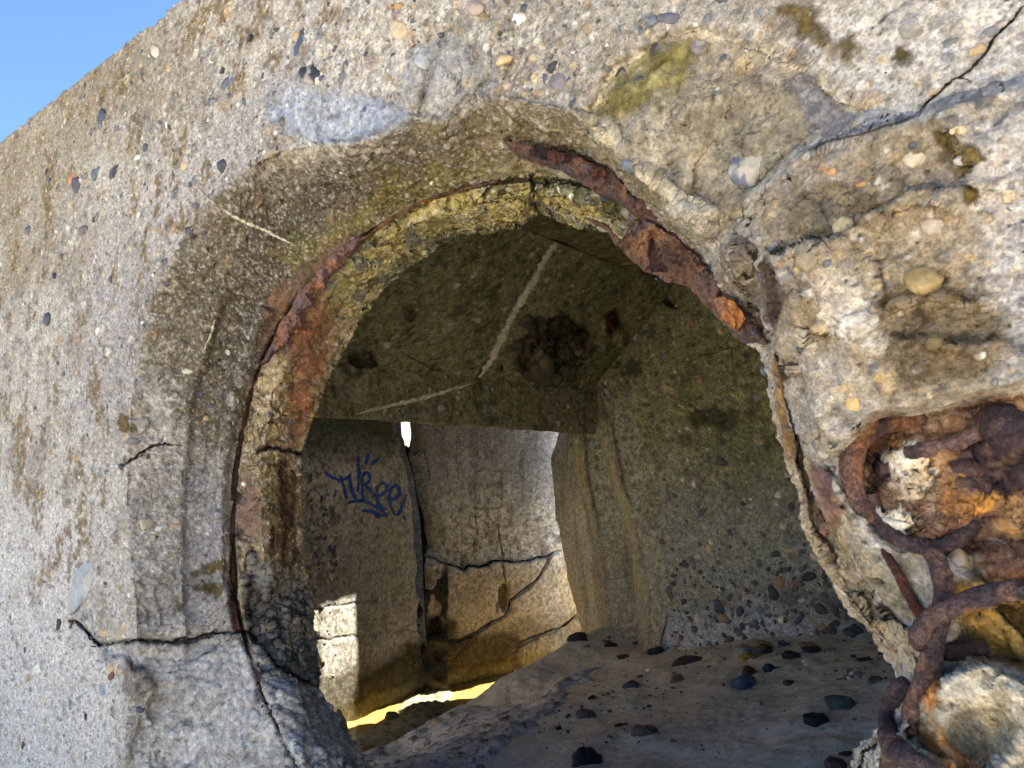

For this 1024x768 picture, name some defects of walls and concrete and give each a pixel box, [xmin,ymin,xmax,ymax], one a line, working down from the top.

crack [804,5,1024,153]
corrosion [284,298,334,438]
corrosion [259,234,360,363]
corrosion [605,309,620,337]
crack [126,436,182,464]
corrosion [231,463,260,537]
peeling [876,440,944,535]
crack [71,620,319,687]
crack [430,508,555,661]
crack [512,614,577,650]